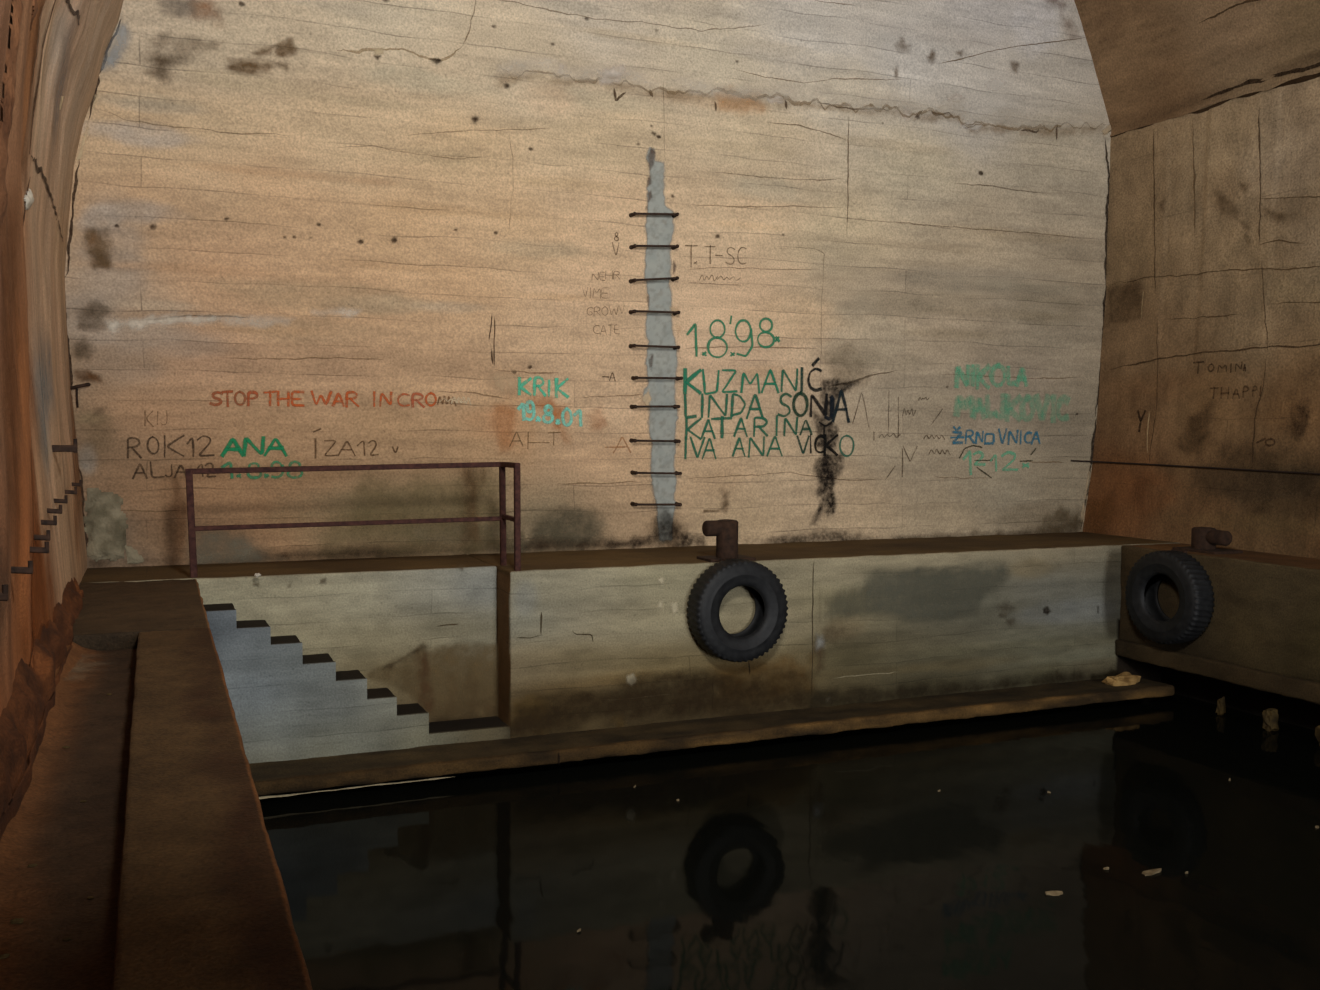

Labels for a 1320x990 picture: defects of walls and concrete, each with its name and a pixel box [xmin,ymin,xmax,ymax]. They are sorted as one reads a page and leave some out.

crack [1200,0,1259,23]
crack [1203,62,1320,100]
crack [23,0,121,277]
crack [501,68,1111,527]
crack [65,312,73,386]
damp [815,380,855,521]
crack [79,468,88,550]